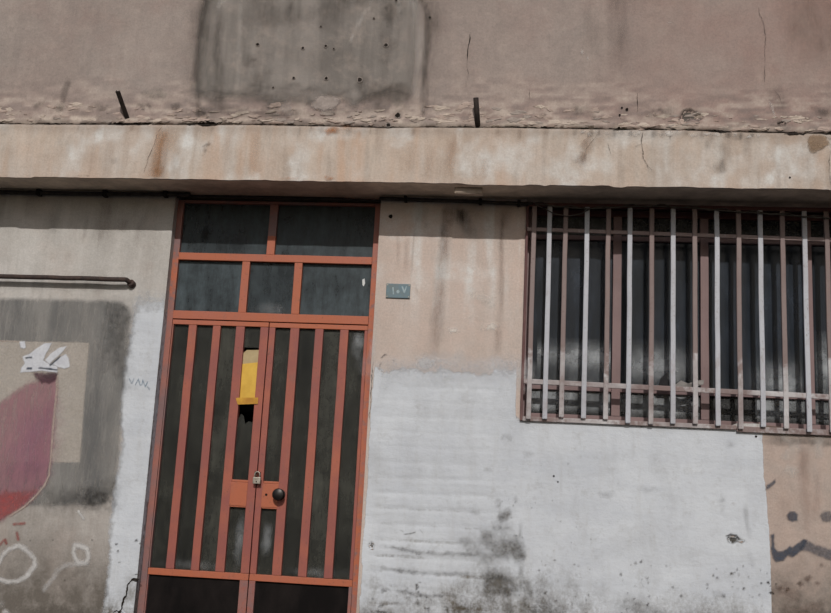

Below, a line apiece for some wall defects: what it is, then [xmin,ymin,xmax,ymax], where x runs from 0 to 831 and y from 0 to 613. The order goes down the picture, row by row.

flaking render [0,102,831,152]